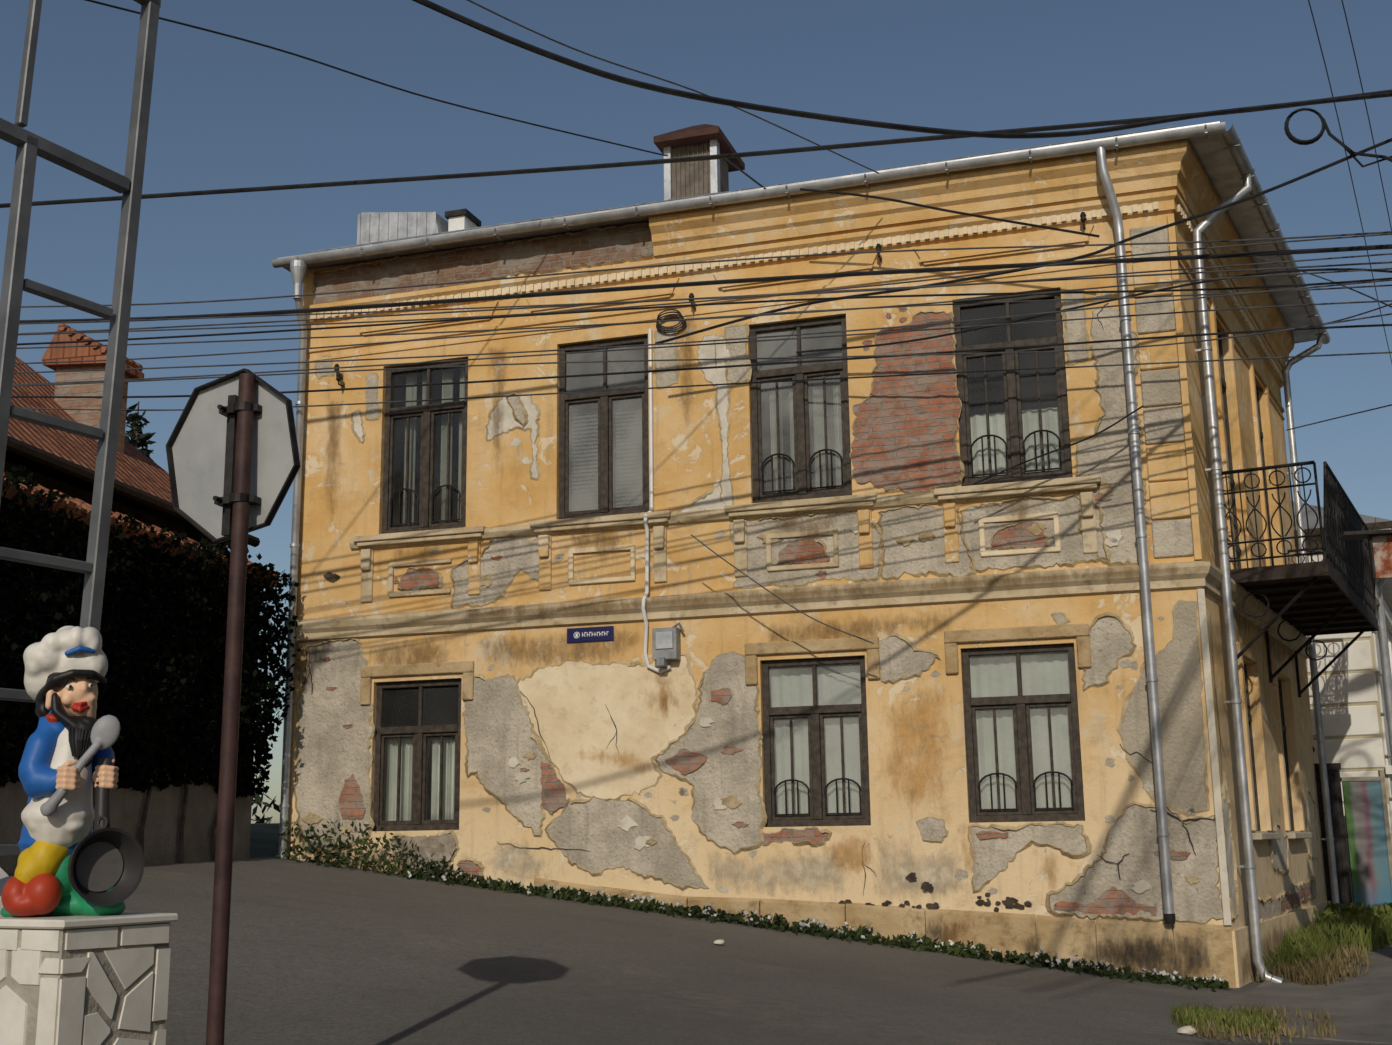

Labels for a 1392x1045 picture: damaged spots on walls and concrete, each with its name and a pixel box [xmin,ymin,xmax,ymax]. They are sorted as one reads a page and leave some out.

peeling [485,391,541,481]
flaking render [653,288,1154,589]
flaking render [879,633,941,691]
flaking render [293,638,375,863]
peeling [462,651,832,893]
flaking render [954,599,1318,925]
flaking render [379,830,485,879]
peeling [838,872,940,910]
flaking render [916,817,949,844]